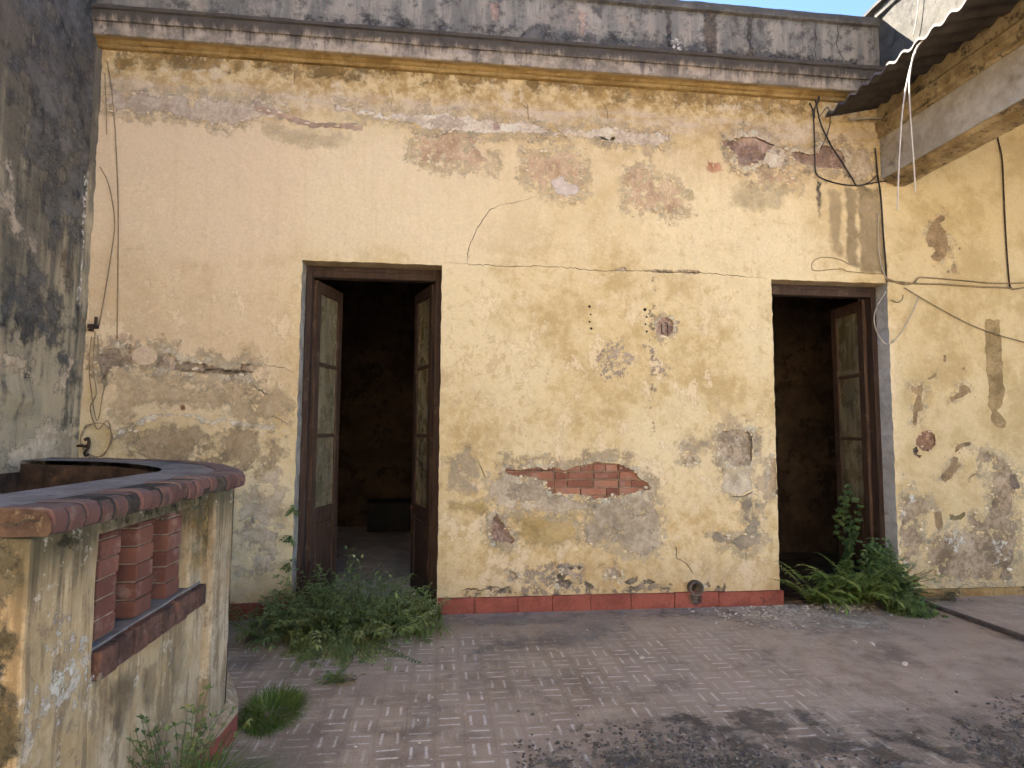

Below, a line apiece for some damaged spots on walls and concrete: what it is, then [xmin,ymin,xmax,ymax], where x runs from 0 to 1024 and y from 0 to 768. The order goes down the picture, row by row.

water stain [7,0,95,249]
peeling [251,103,669,203]
flaking render [706,121,855,186]
crack [450,197,760,278]
water stain [843,138,901,273]
water stain [0,255,80,368]
flaking render [53,334,267,393]
flaking render [496,449,661,513]
flaking render [708,415,778,502]
flaking render [911,374,938,458]
water stain [984,319,1006,428]
water stain [0,623,21,768]